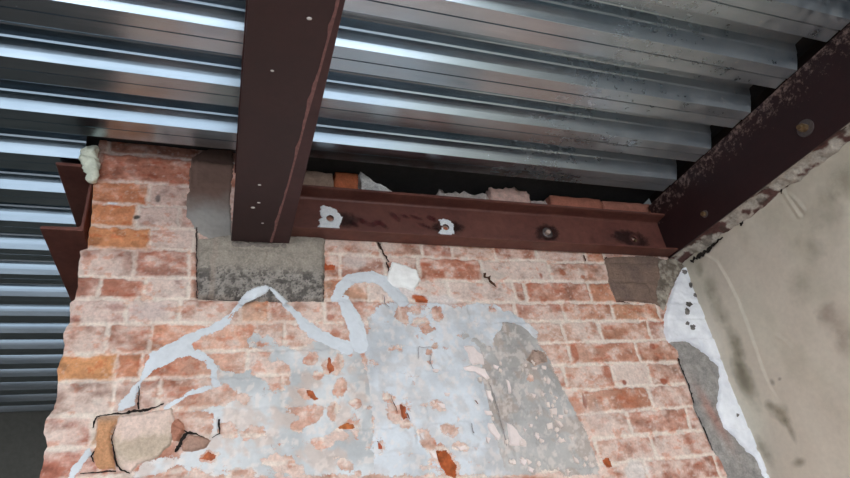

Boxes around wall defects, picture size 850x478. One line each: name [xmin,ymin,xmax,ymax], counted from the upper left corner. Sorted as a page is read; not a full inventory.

flaking render [387,262,428,303]
flaking render [682,270,697,330]
peeling [463,345,527,447]
spalling [521,350,574,443]
spalling [93,418,118,470]
crack [80,386,164,474]
spalling [171,419,216,461]
crack [174,419,220,452]
spalling [430,445,478,478]
spalling [566,456,612,475]